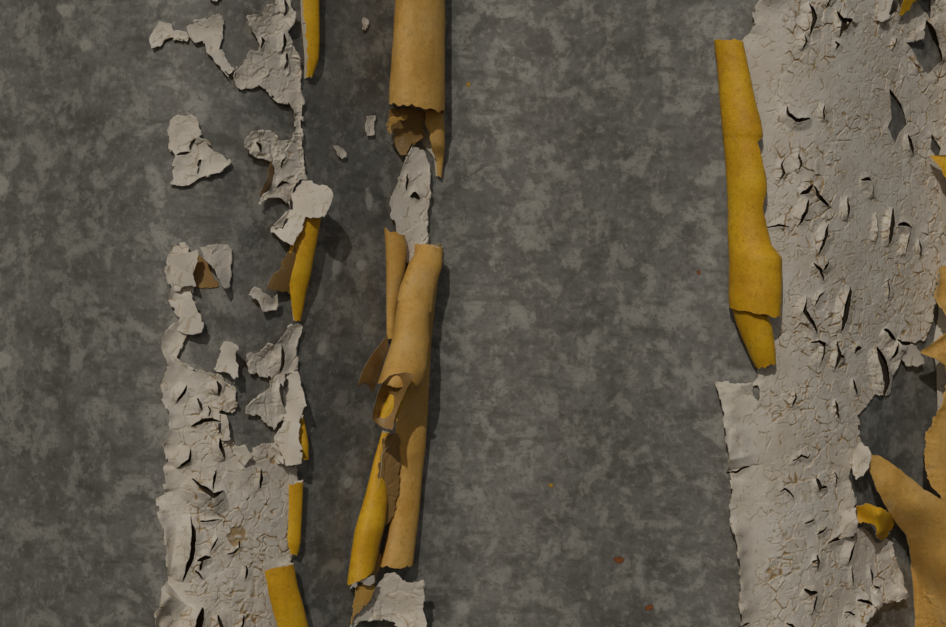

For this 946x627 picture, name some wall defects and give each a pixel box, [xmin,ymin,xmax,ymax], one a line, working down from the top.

peeling [899,0,916,16]
peeling [365,116,376,136]
peeling [149,0,333,430]
peeling [386,139,440,263]
crack [715,0,946,627]
crack [154,242,307,627]
peeling [377,431,401,525]
peeling [350,550,427,627]